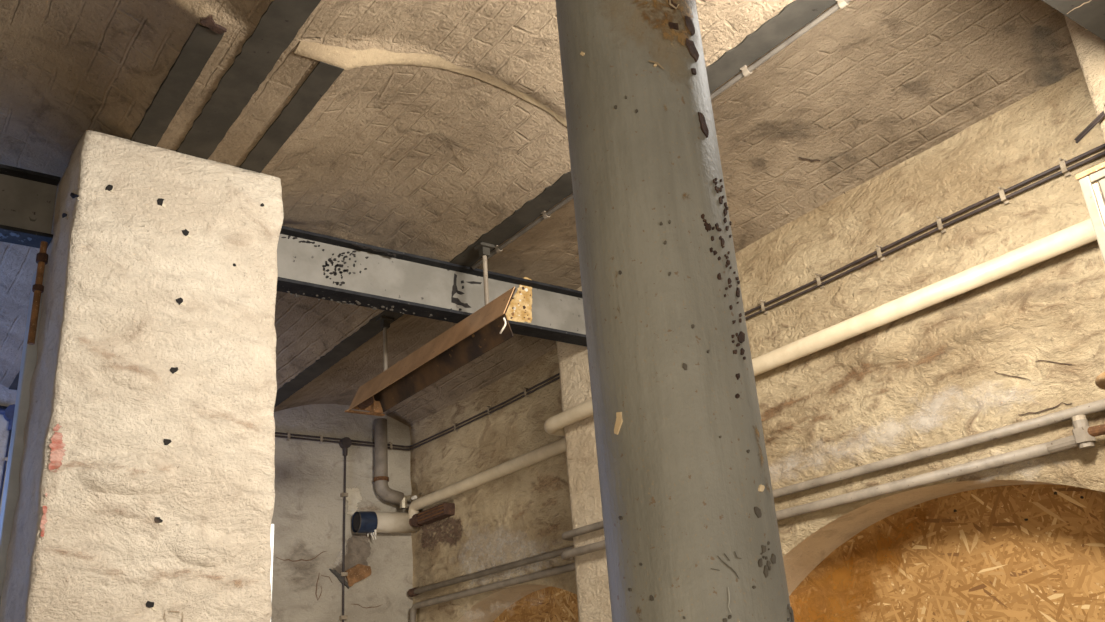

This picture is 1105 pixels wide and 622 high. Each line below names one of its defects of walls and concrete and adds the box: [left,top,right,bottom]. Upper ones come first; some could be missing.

peeling [281,235,396,286]
peeling [429,269,482,319]
peeling [701,178,746,360]